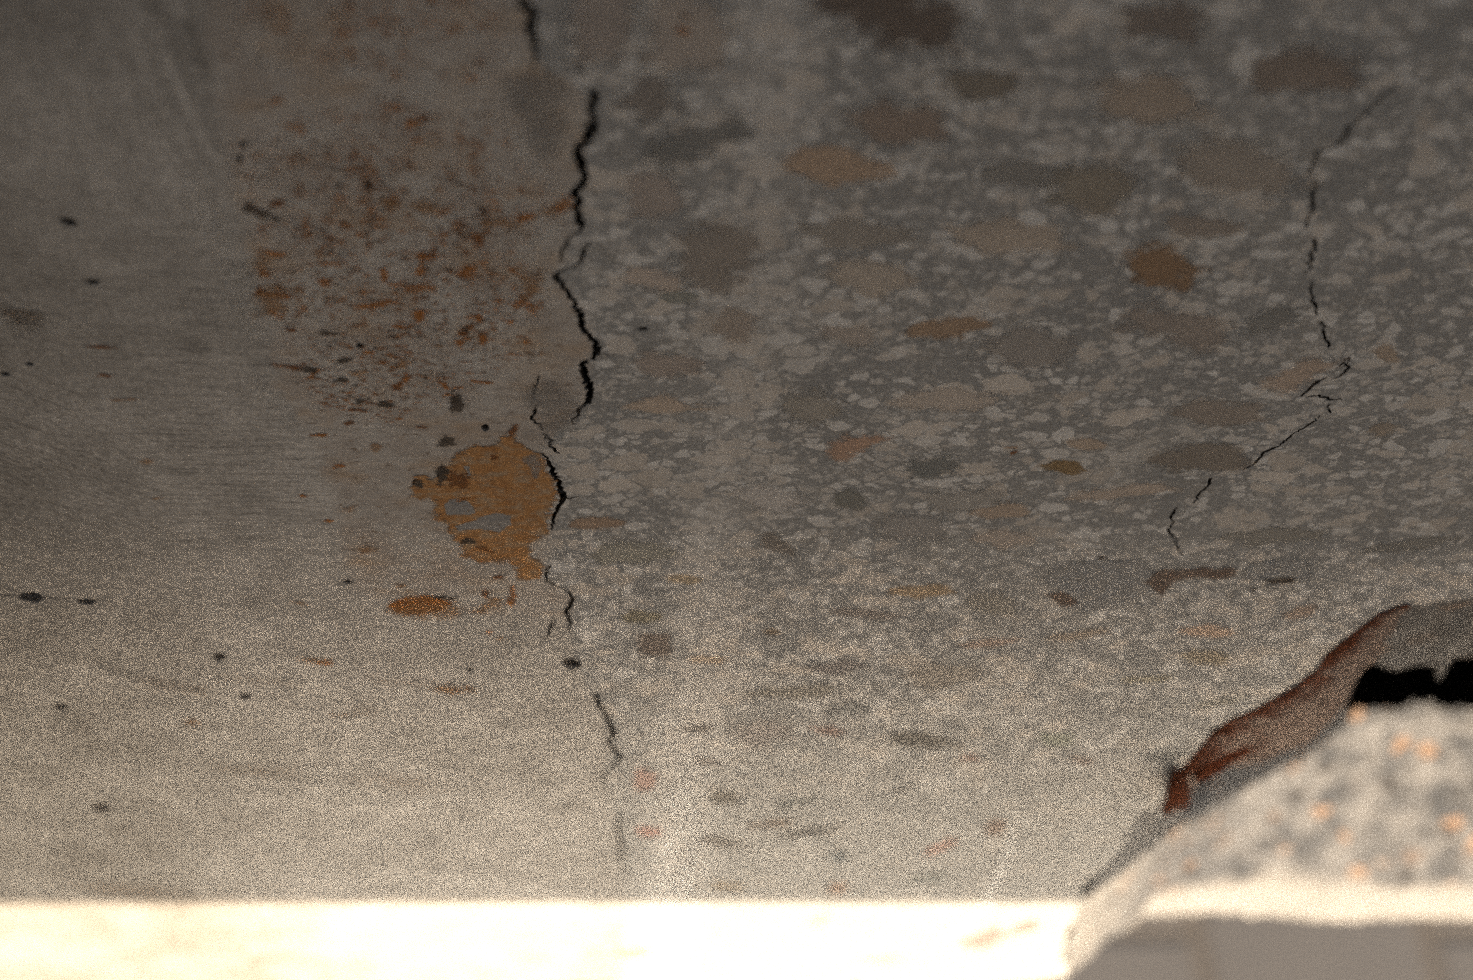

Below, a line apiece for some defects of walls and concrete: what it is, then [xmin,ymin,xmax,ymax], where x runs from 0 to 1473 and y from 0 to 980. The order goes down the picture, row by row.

crack [517,0,539,65]
rust [235,104,574,429]
crack [530,52,616,530]
crack [1167,87,1397,555]
rust [386,584,517,616]
crack [544,565,576,639]
crack [593,692,626,876]
spalling [1060,596,1473,974]
rust [1161,604,1411,816]